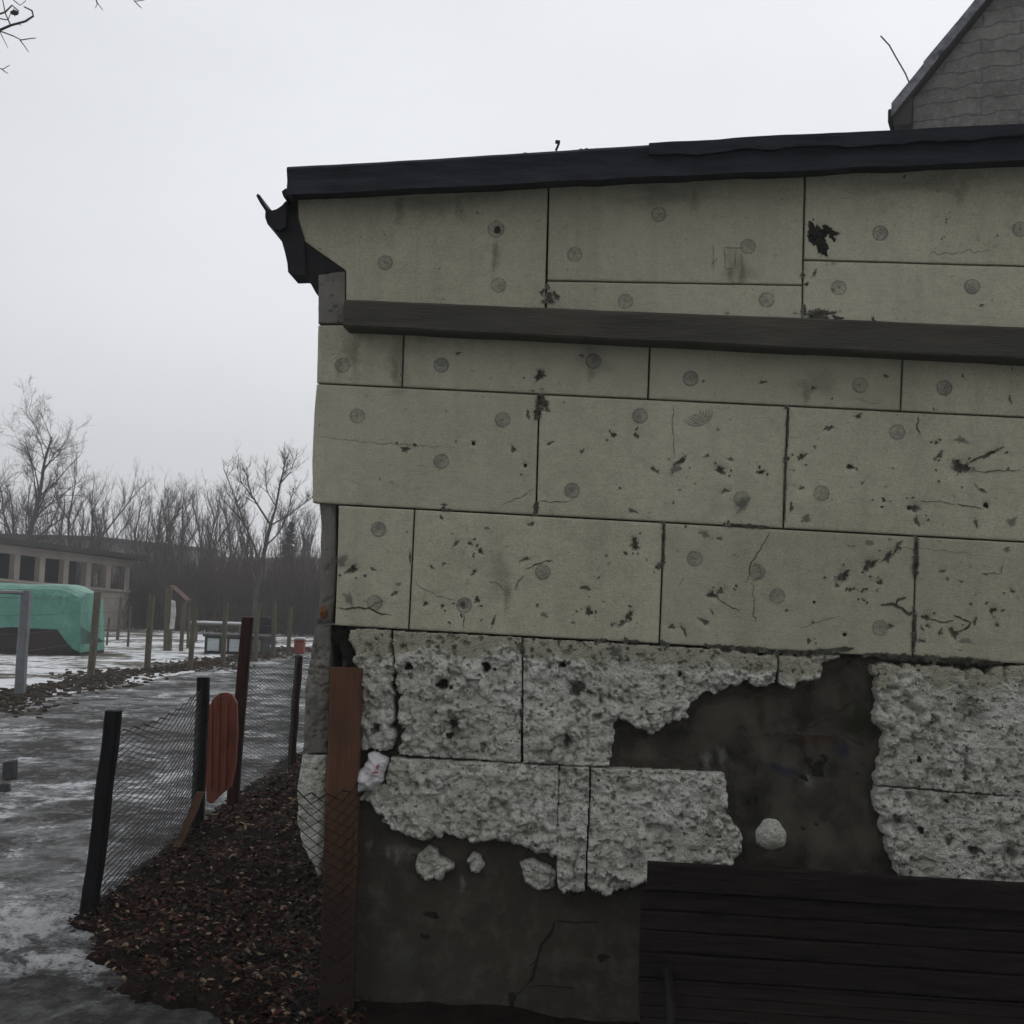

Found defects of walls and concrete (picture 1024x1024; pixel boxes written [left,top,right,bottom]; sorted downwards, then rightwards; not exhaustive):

spalling [610,605,638,658]
spalling [617,654,889,874]